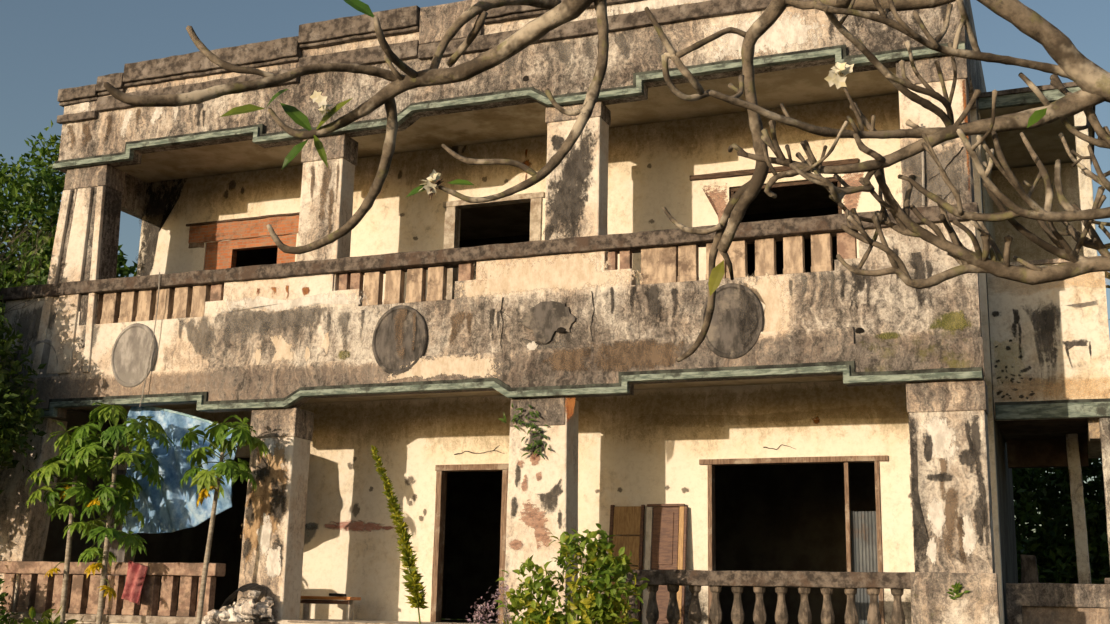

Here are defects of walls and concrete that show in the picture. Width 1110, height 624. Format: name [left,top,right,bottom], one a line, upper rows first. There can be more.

leakage [67,115,112,148]
leakage [189,103,206,126]
leakage [543,125,600,240]
leakage [178,306,365,361]
leakage [386,309,501,381]
leakage [543,340,683,371]
leakage [630,285,679,325]
leakage [738,281,759,351]
leakage [992,300,1098,399]
leakage [243,457,287,566]
flaking render [517,452,552,550]
leakage [908,415,989,572]